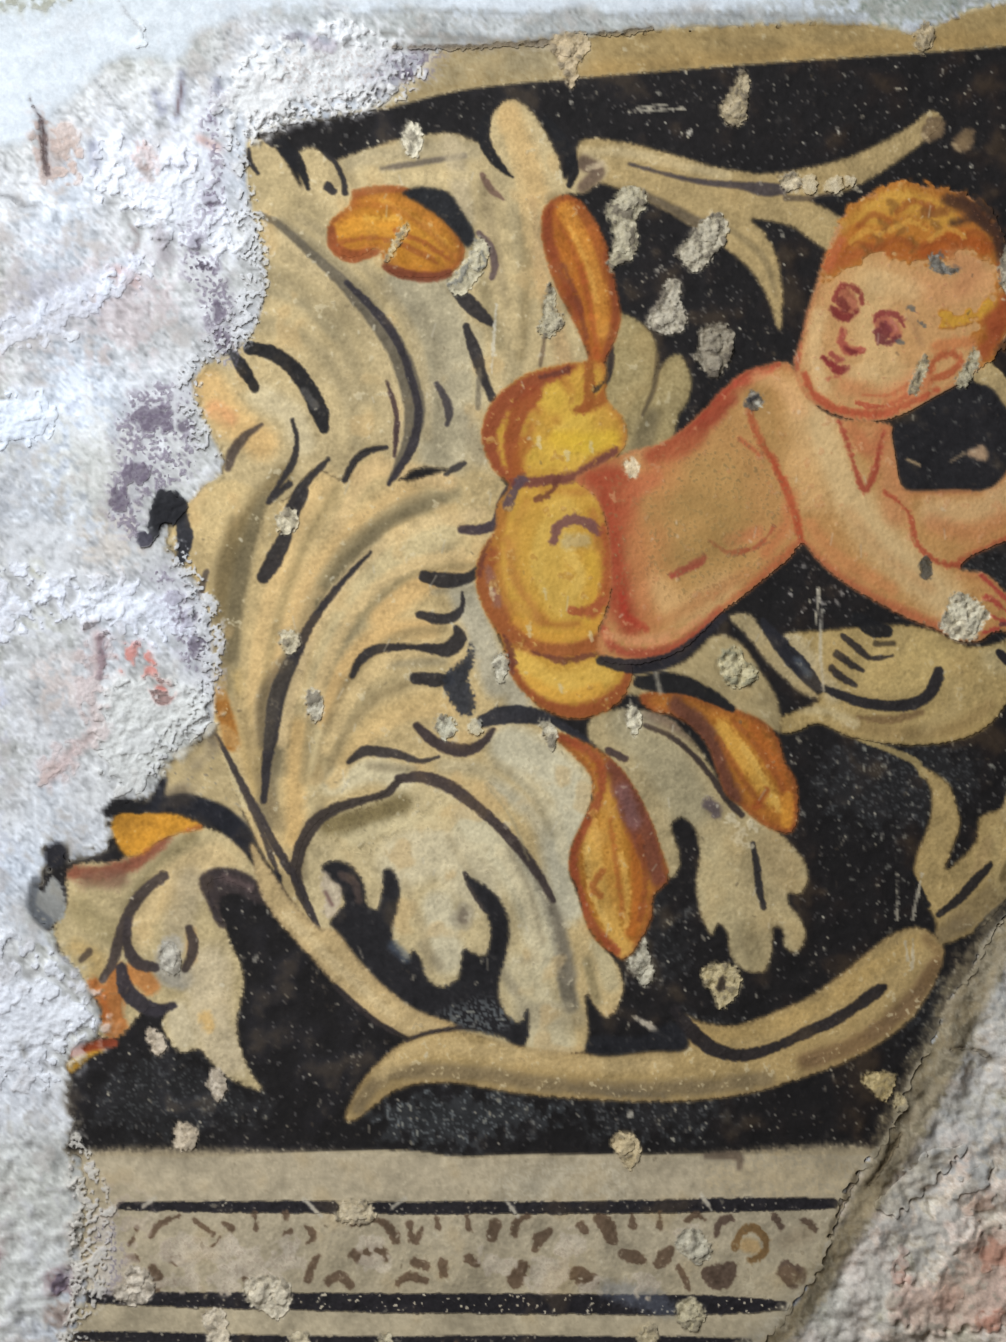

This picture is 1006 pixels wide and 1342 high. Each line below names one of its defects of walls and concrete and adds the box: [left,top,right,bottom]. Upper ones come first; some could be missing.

peeling [179,91,235,353]
spalling [604,185,647,272]
spalling [645,212,735,378]
peeling [107,381,198,547]
spalling [938,592,991,642]
peeling [92,571,215,798]
spalling [626,937,655,988]
spalling [701,962,743,1010]
spalling [146,1027,167,1056]
spalling [173,1121,199,1152]
spalling [610,1131,642,1171]
spalling [765,915,1006,1342]